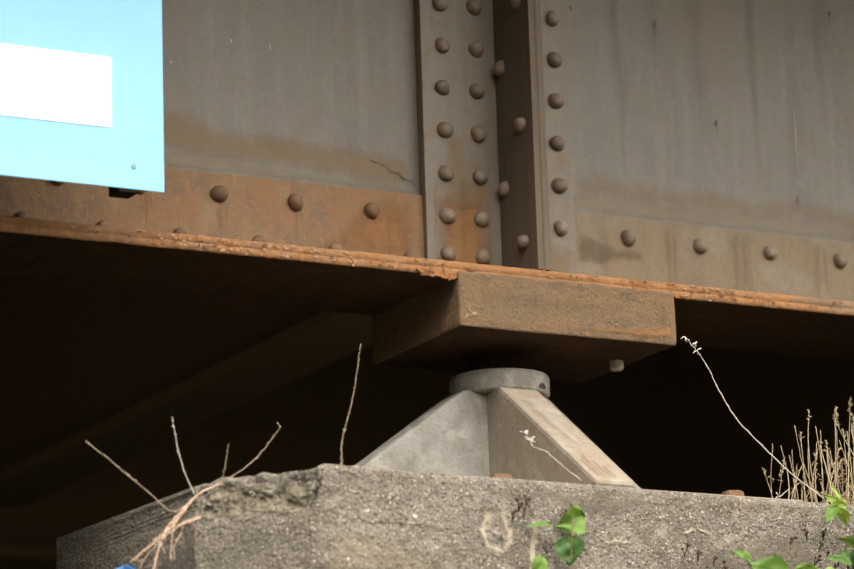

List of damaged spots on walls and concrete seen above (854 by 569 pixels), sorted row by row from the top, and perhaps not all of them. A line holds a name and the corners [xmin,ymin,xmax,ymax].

corrosion [153,234,299,258]
corrosion [310,191,485,281]
corrosion [667,282,818,309]